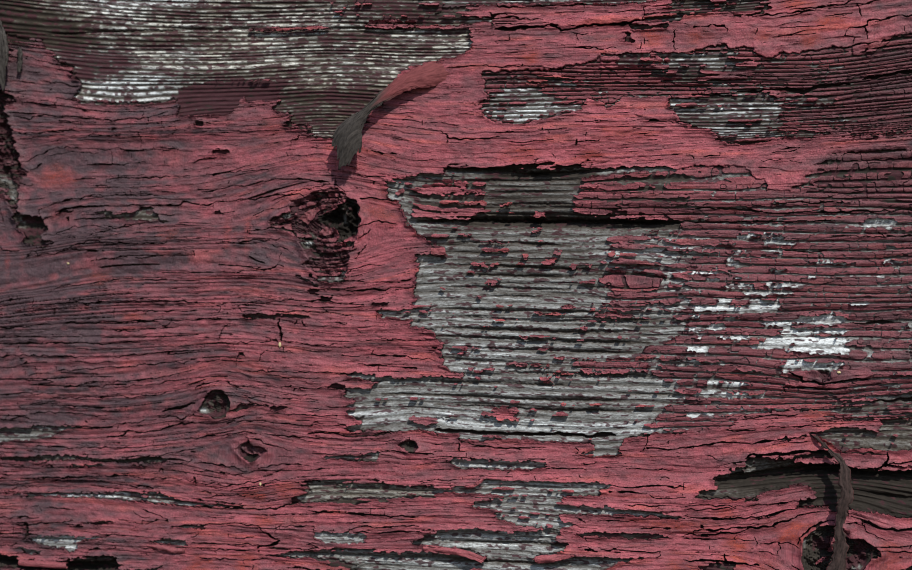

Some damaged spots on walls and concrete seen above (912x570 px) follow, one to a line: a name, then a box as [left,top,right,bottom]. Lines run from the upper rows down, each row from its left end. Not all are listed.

peeling [0,0,912,170]
crack [0,98,616,570]
peeling [324,151,912,518]
peeling [1,454,168,468]
peeling [0,521,206,570]
peeling [12,491,243,510]
peeling [276,458,685,570]